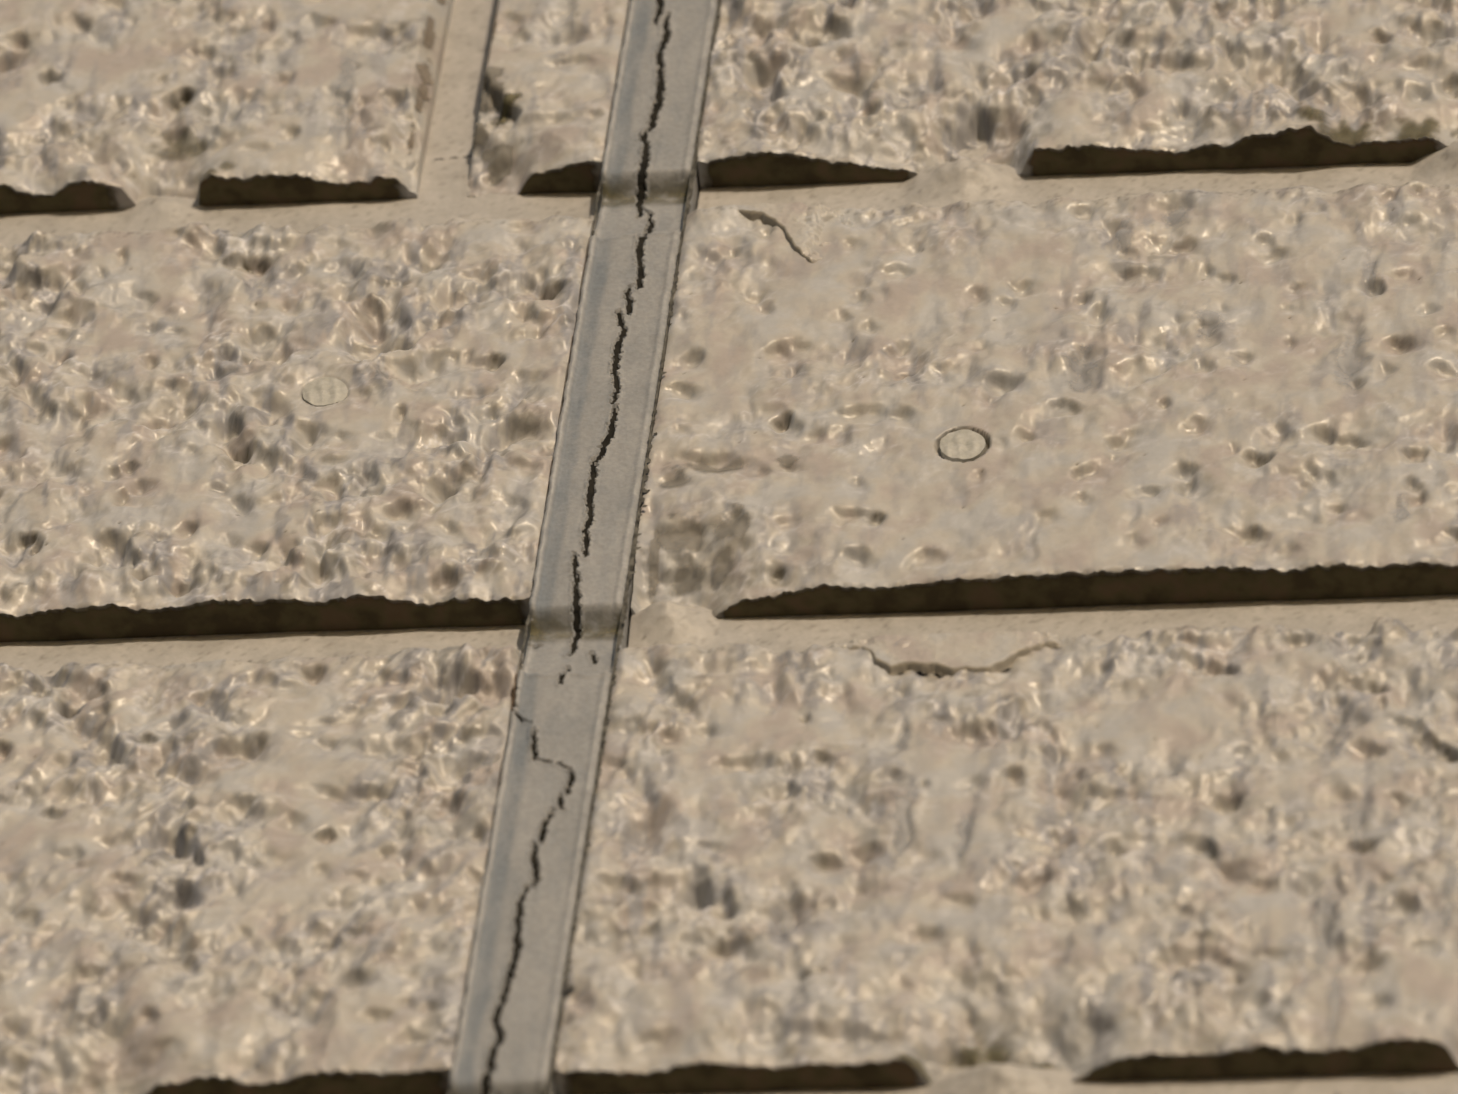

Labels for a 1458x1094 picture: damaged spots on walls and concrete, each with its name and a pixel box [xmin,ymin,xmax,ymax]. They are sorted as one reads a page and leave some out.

crack [447,0,721,1094]